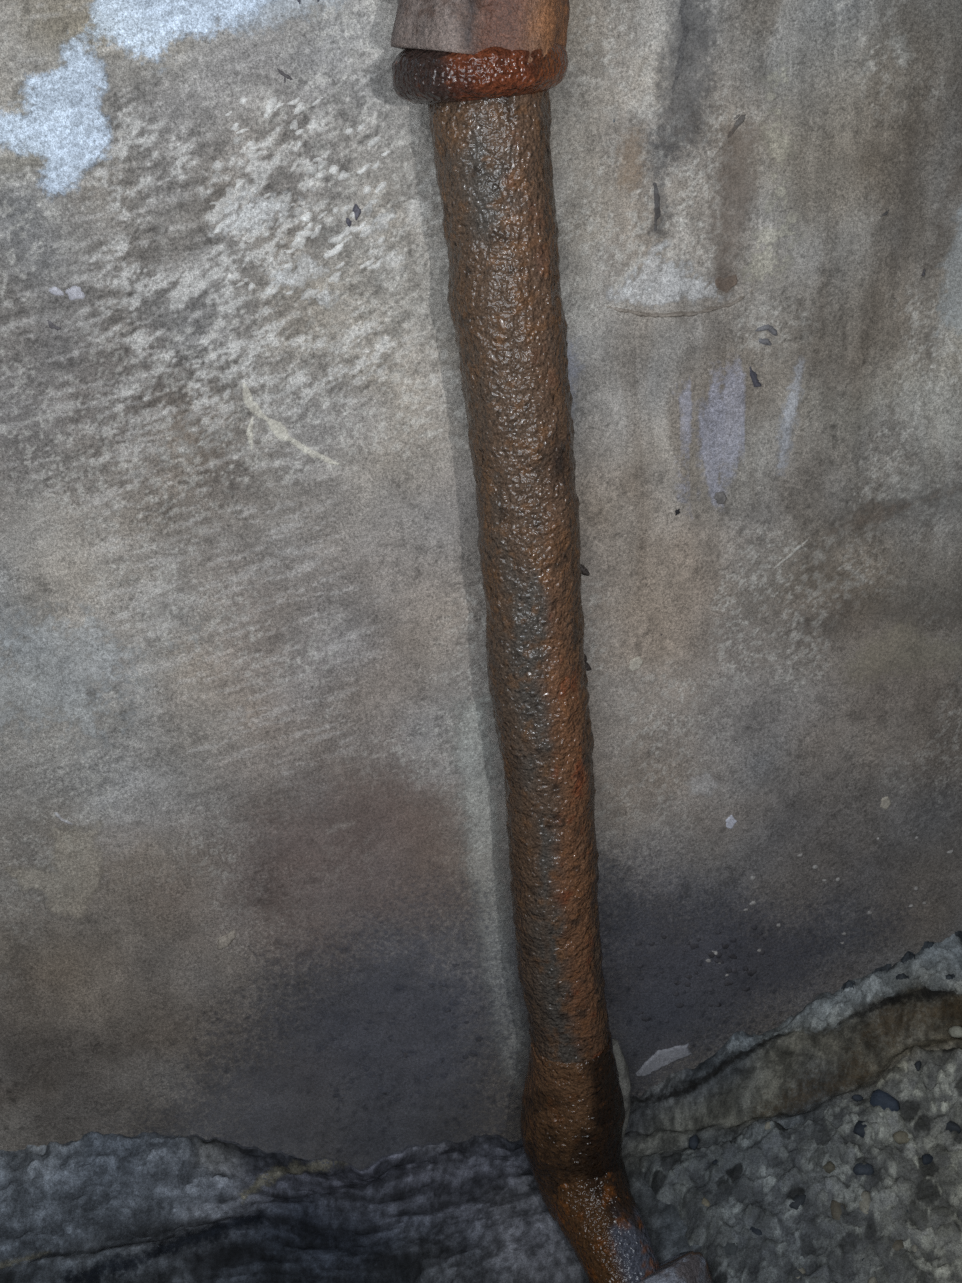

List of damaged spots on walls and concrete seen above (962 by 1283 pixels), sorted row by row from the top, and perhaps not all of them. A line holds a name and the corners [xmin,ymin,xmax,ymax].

damp [647,0,716,235]
damp [679,367,745,503]
damp [778,361,804,468]
damp [164,909,517,1171]
damp [601,891,886,1097]
spalling [718,931,962,1061]
spalling [635,1026,962,1283]